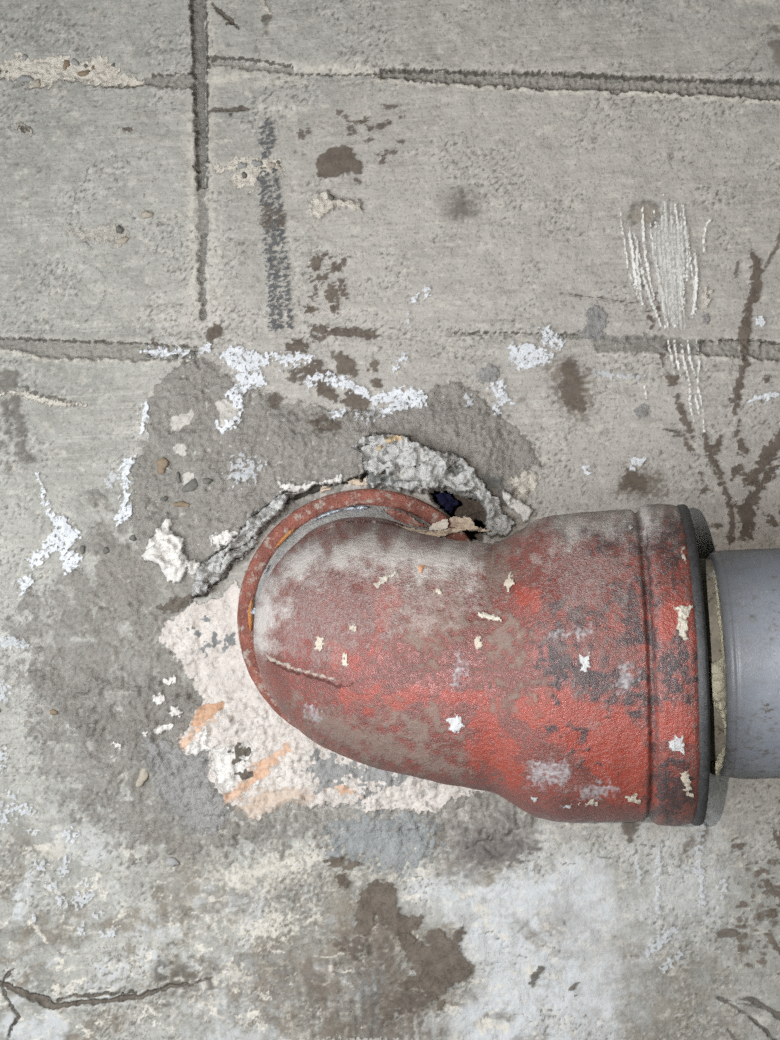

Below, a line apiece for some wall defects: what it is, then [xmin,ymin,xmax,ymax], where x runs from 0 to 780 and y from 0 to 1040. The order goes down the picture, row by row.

damp [507,325,564,371]
damp [137,401,149,435]
damp [139,342,428,434]
damp [486,379,515,415]
damp [674,233,780,545]
damp [104,455,136,527]
damp [222,453,267,488]
spalling [156,432,541,614]
damp [302,928,420,1040]